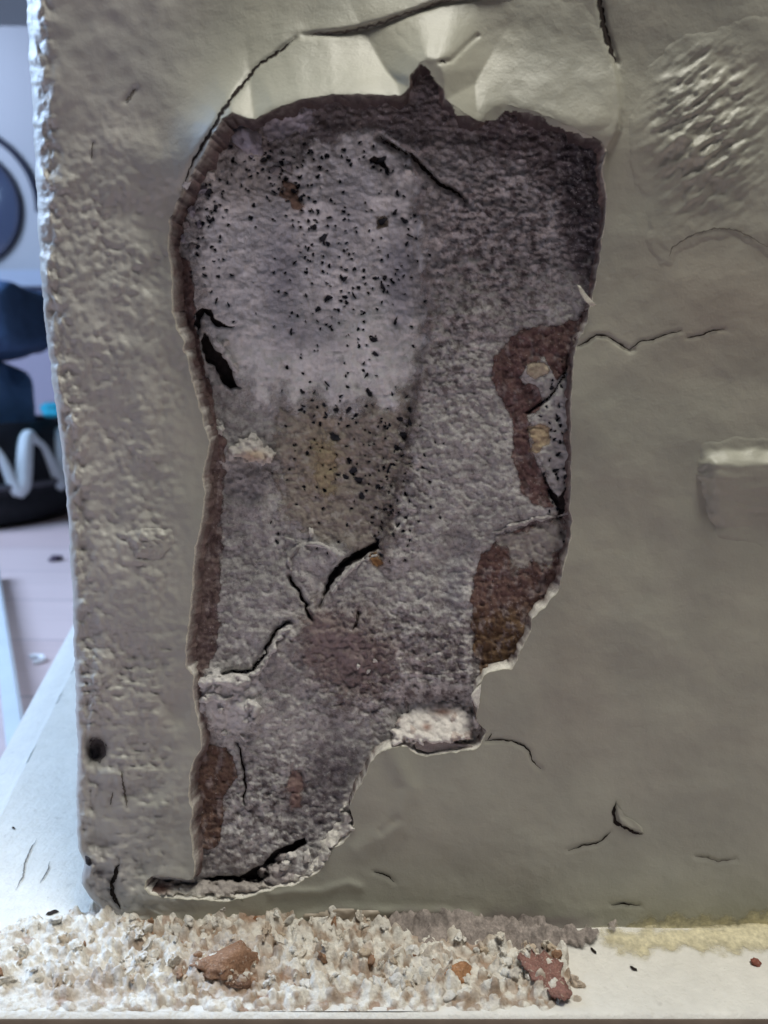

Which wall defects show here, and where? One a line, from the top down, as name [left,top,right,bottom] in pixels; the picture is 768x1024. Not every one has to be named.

crack [597,0,616,63]
crack [185,0,454,182]
crack [578,329,722,351]
spalling [144,62,607,902]
crack [487,733,541,769]
crack [568,834,608,851]